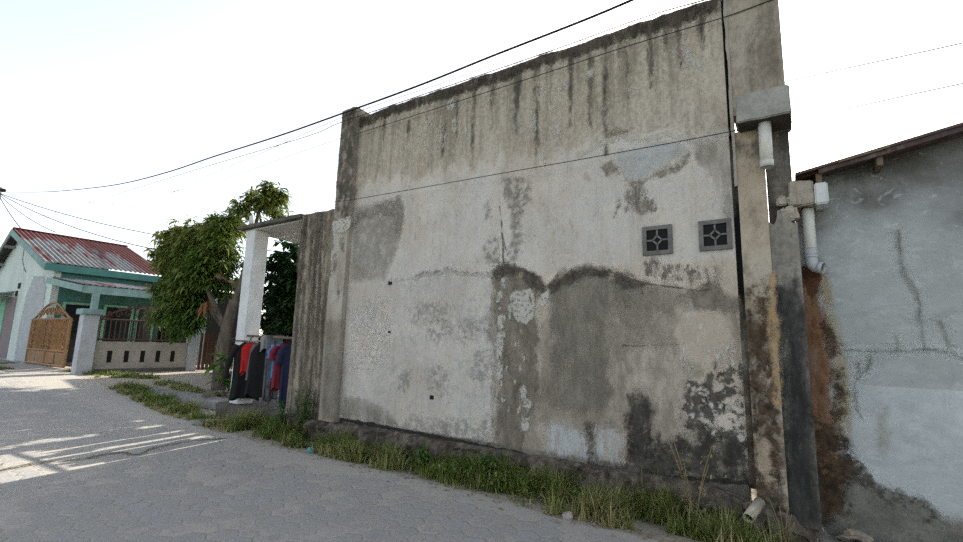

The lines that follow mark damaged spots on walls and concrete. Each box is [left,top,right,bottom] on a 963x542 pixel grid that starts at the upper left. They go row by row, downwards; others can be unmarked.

water stain [292,0,718,416]
peeling [494,277,550,431]
peeling [680,354,745,442]
water stain [486,178,963,542]
flaking render [755,438,775,485]
rust [802,266,850,517]
crack [896,232,948,343]